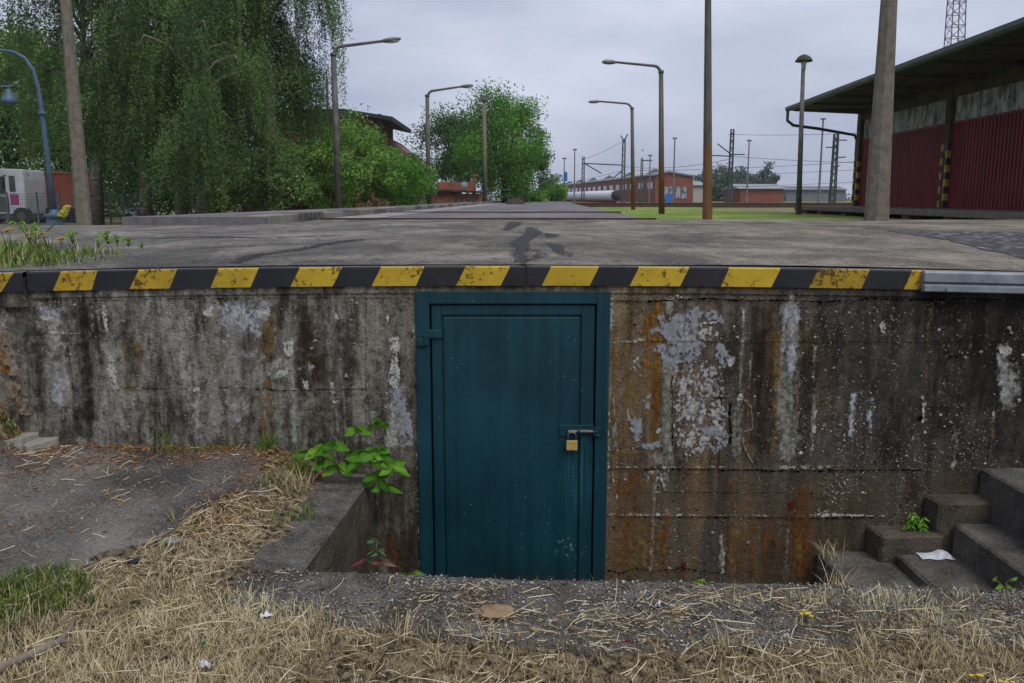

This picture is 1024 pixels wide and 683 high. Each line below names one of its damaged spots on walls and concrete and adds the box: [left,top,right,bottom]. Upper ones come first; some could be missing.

water stain [29,307,94,434]
water stain [83,305,111,346]
water stain [190,379,247,438]
water stain [203,302,329,444]
peeling [364,328,415,449]
rust [612,299,665,454]
water stain [740,295,801,461]
peeling [610,293,1024,570]